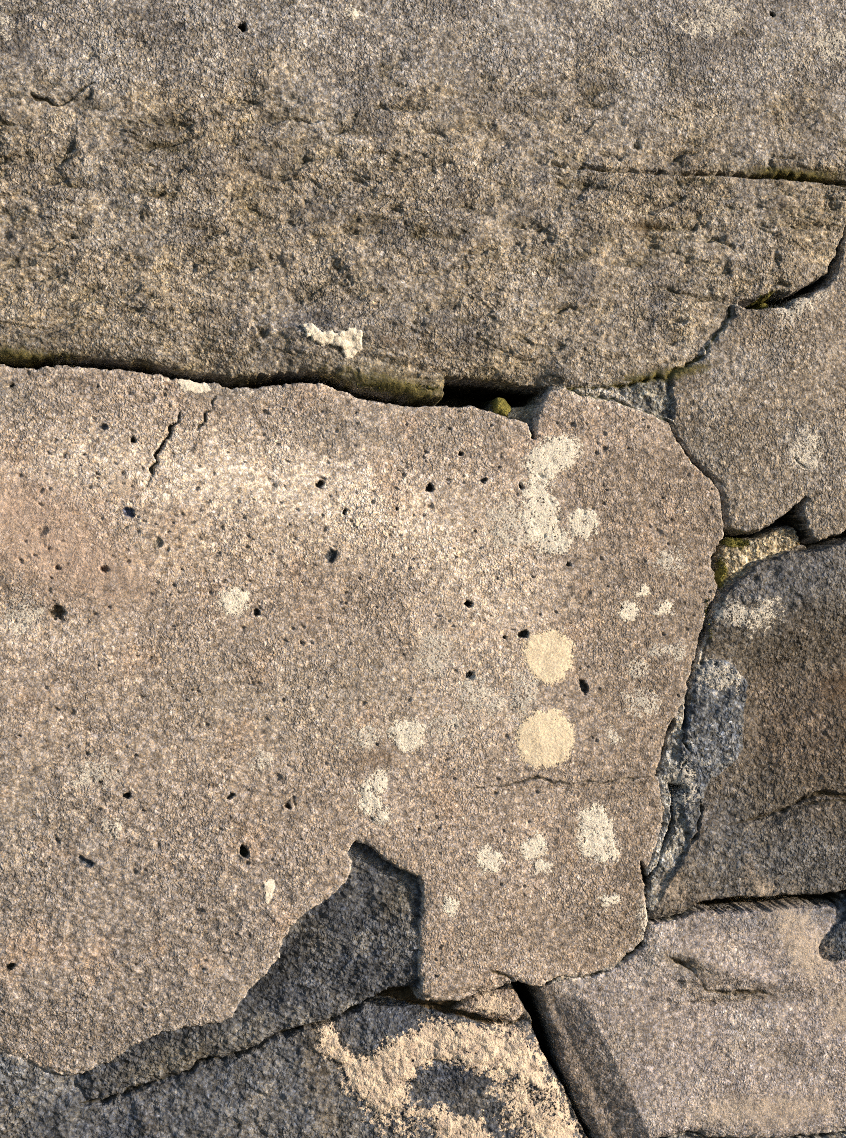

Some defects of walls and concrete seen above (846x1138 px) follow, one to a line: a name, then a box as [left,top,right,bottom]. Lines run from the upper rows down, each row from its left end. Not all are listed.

crack [552,165,846,187]
crack [0,348,71,370]
crack [80,223,846,1138]